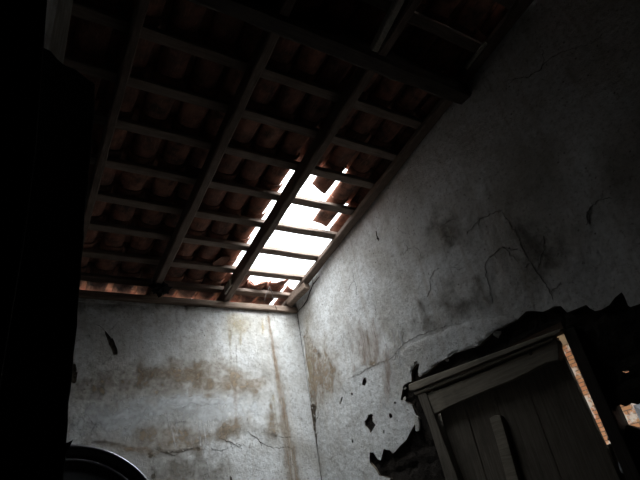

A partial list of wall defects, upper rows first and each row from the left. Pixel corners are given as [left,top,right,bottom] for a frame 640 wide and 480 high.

spalling [104,329,117,355]
leakage [121,364,218,404]
leakage [303,335,336,405]
flaking render [372,294,640,480]
leakage [139,424,224,480]
leakage [217,423,241,440]
leakage [279,398,299,480]